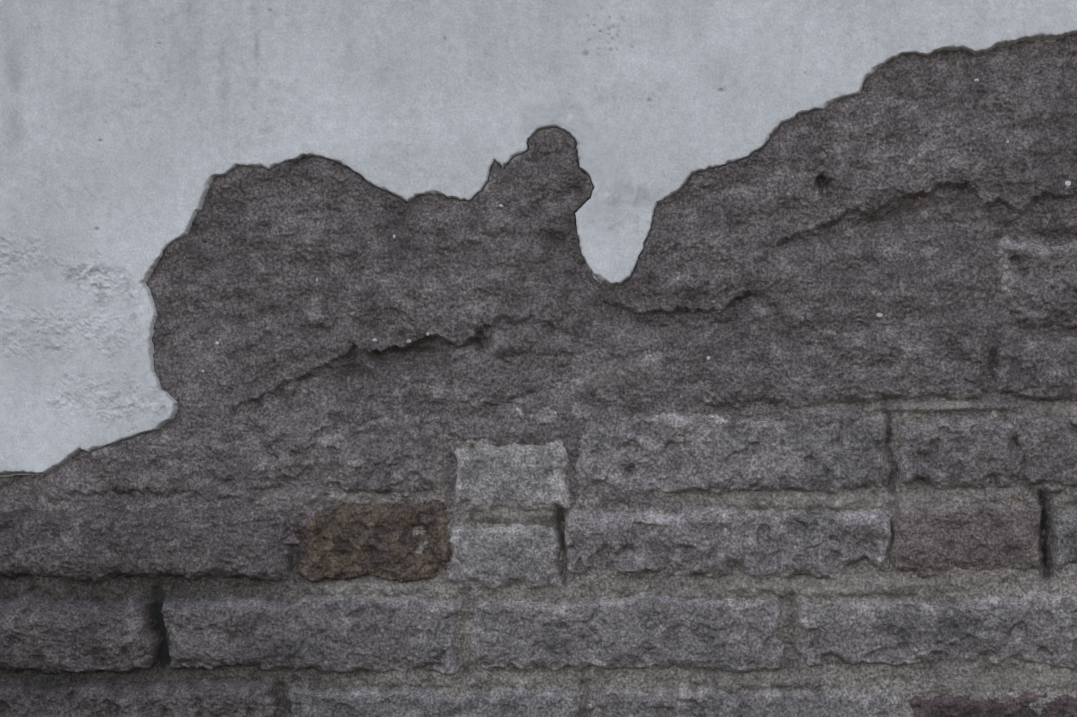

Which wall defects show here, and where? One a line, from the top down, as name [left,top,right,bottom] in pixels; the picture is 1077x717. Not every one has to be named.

peeling [0,31,1077,591]
spalling [0,594,460,675]
spalling [469,593,786,673]
spalling [798,591,1077,669]
spalling [909,691,1077,717]